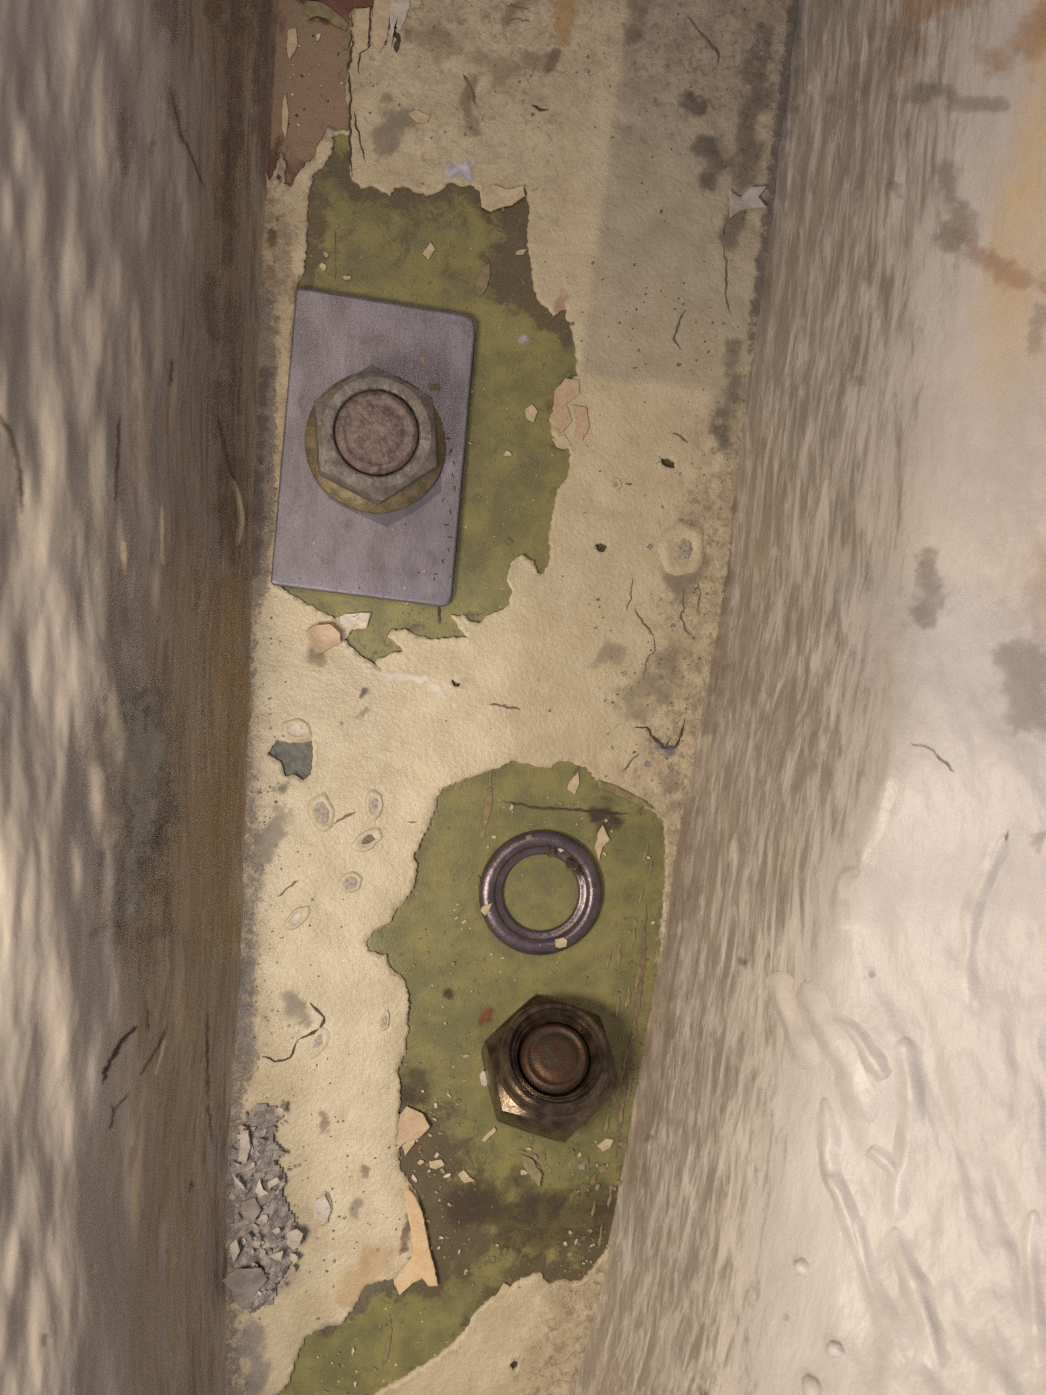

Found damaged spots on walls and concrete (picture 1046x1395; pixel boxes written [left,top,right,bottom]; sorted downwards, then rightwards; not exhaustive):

peeling [269,0,590,666]
crack [626,579,701,679]
spalling [268,740,312,780]
crack [621,718,685,772]
crack [102,1009,166,1130]
crack [261,1003,325,1063]
peeling [279,761,665,1395]
spalling [222,1103,303,1314]